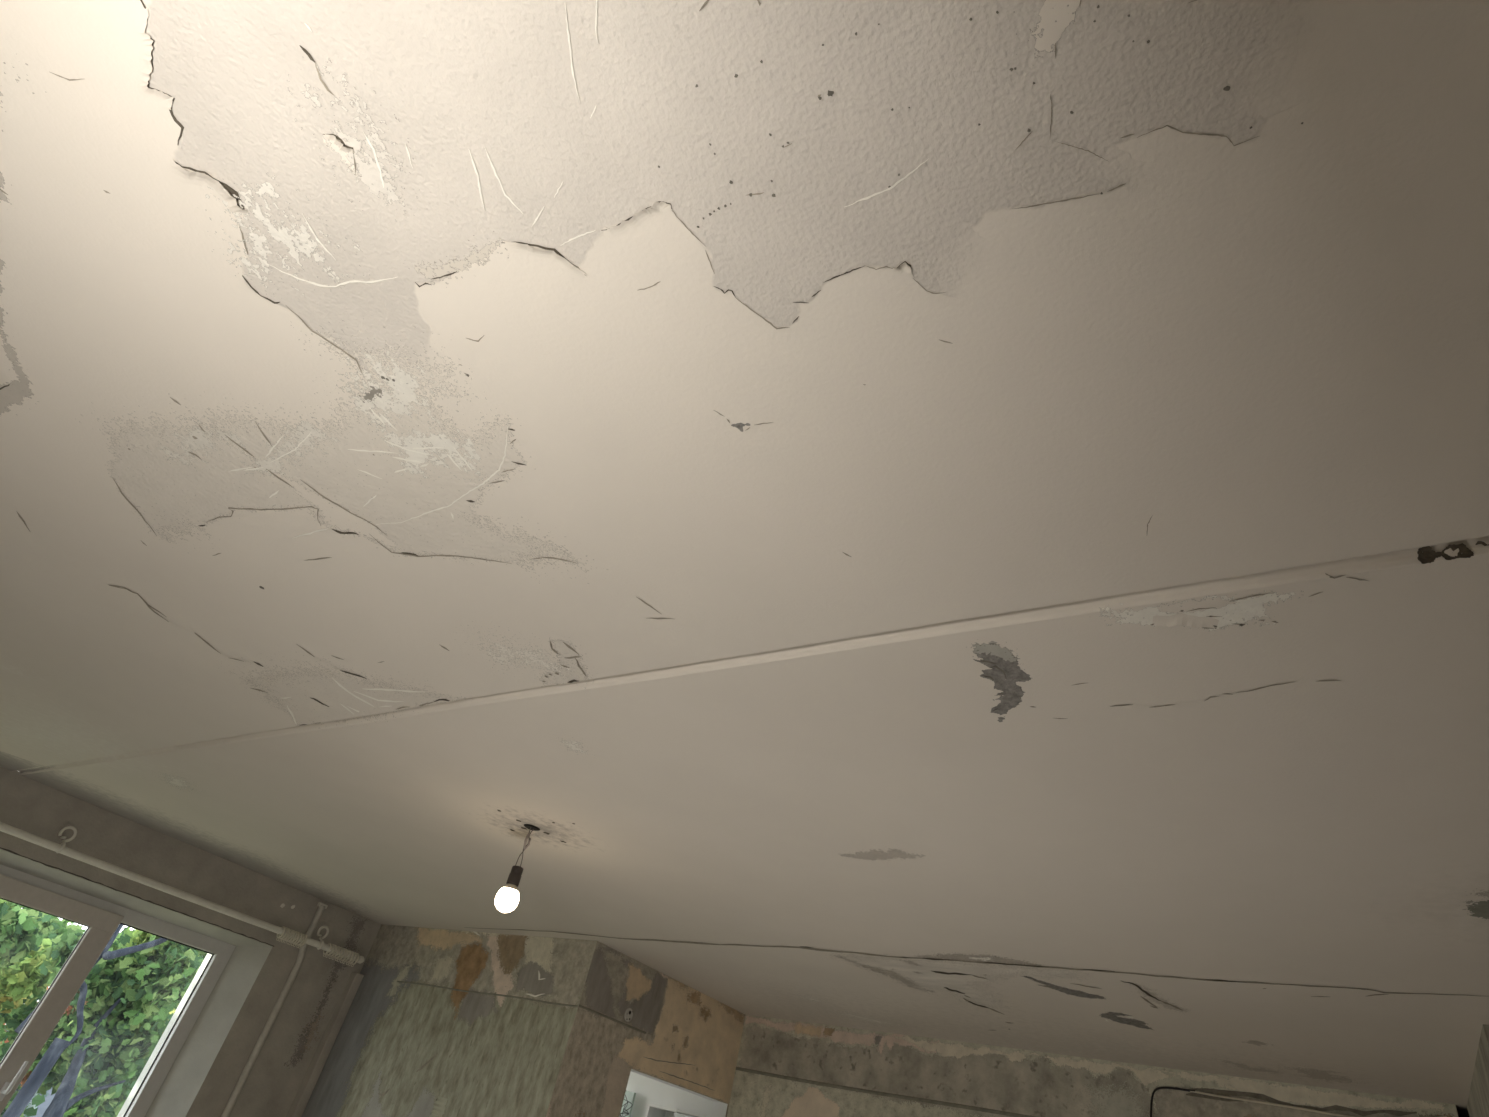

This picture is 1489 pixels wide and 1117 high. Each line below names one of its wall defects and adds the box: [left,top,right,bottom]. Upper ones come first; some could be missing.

peeling [0,172,11,204]
peeling [0,259,36,415]
peeling [79,0,1386,584]
spalling [1417,541,1489,564]
spalling [972,641,1031,722]
crack [464,927,1476,1012]
peeling [302,925,668,1117]
peeling [737,1024,1454,1117]